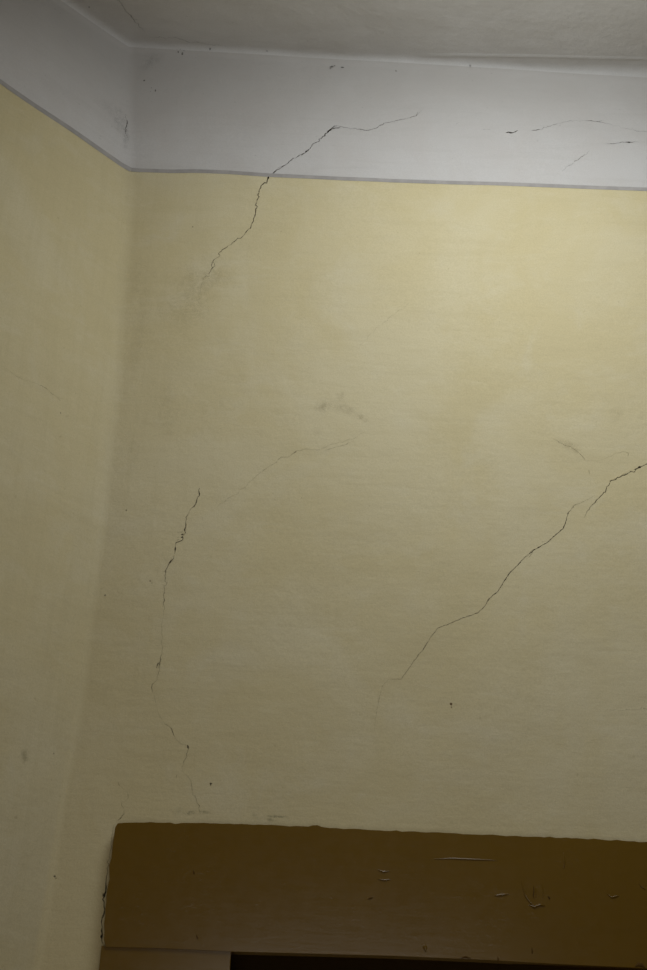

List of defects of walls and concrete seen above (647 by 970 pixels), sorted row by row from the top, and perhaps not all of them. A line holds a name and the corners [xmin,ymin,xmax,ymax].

crack [210,115,417,271]
crack [165,488,200,582]
crack [405,464,647,674]